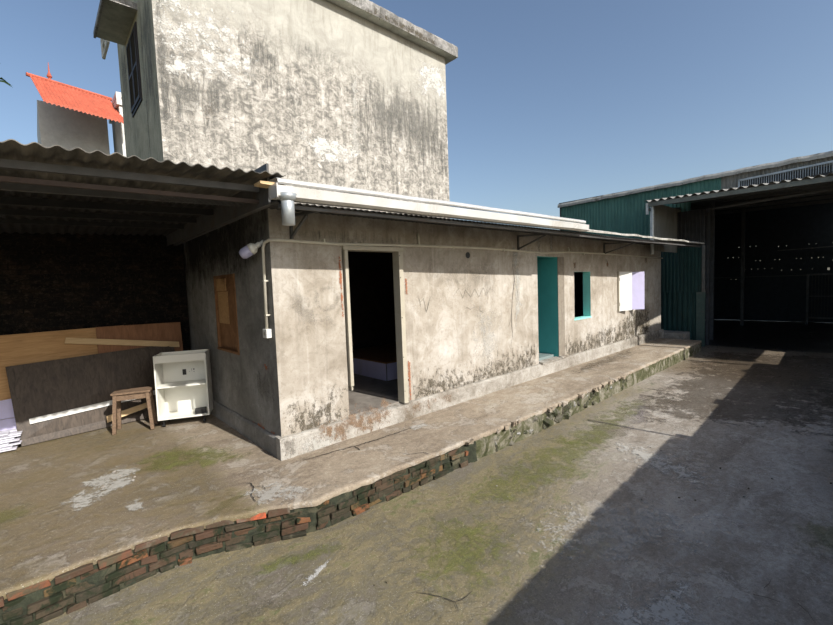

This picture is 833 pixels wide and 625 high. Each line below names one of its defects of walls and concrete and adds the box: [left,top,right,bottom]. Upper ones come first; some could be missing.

damp [349,77,445,169]
damp [566,304,650,355]
damp [413,344,536,396]
damp [283,386,345,433]